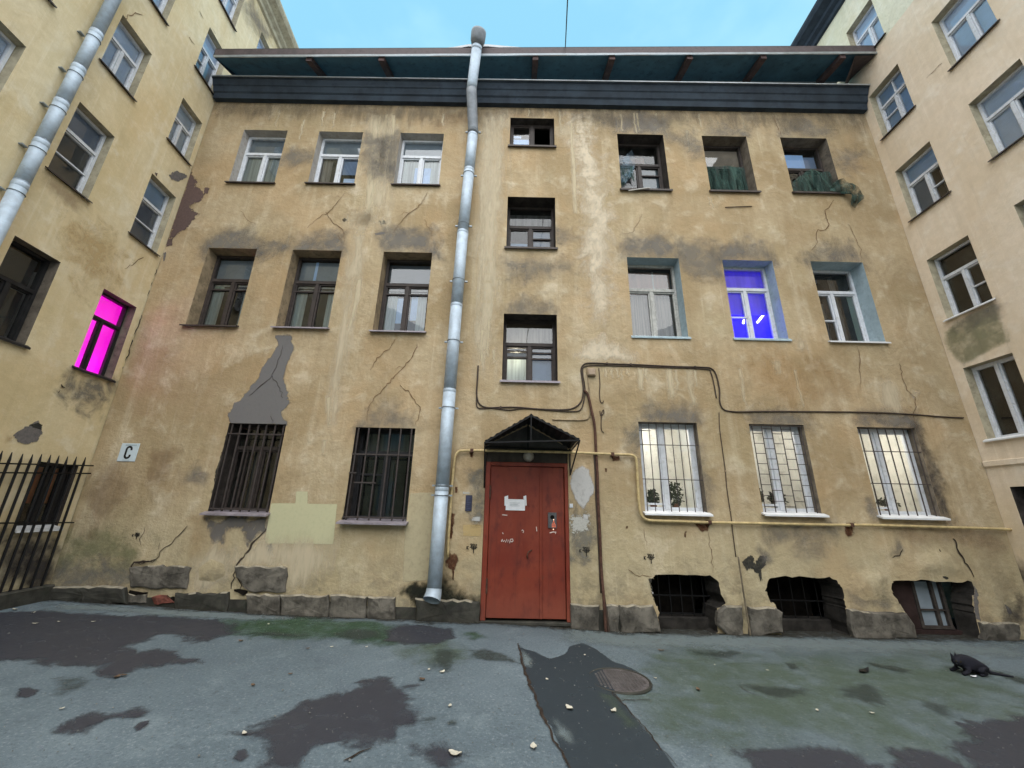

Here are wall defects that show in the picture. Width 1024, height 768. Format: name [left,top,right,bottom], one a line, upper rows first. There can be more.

flaking render [155,171,209,261]
crack [815,200,862,258]
crack [367,340,421,425]
flaking render [13,421,43,444]
crack [128,526,187,601]
crack [231,529,267,596]
leakage [402,583,427,605]
leakage [441,576,475,601]
crack [939,538,974,577]